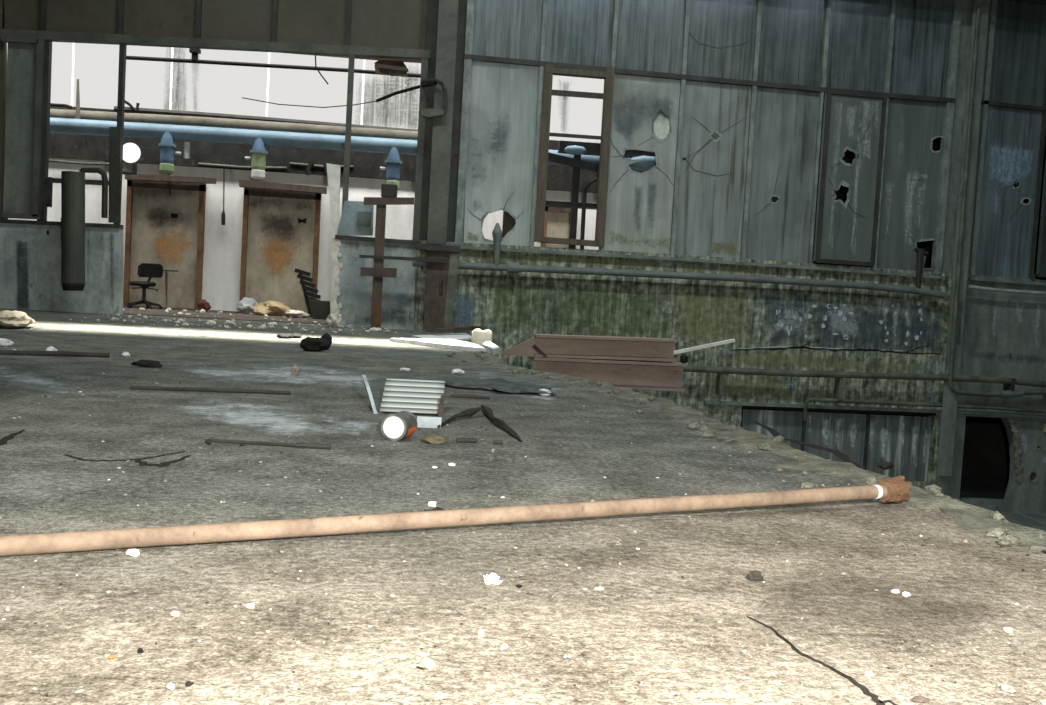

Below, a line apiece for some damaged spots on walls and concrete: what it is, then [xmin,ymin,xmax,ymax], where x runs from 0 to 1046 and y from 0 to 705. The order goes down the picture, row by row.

damp [818,296,937,349]
damp [6,375,52,385]
damp [193,367,368,386]
damp [185,404,311,432]
crack [0,430,25,446]
crack [747,616,898,705]